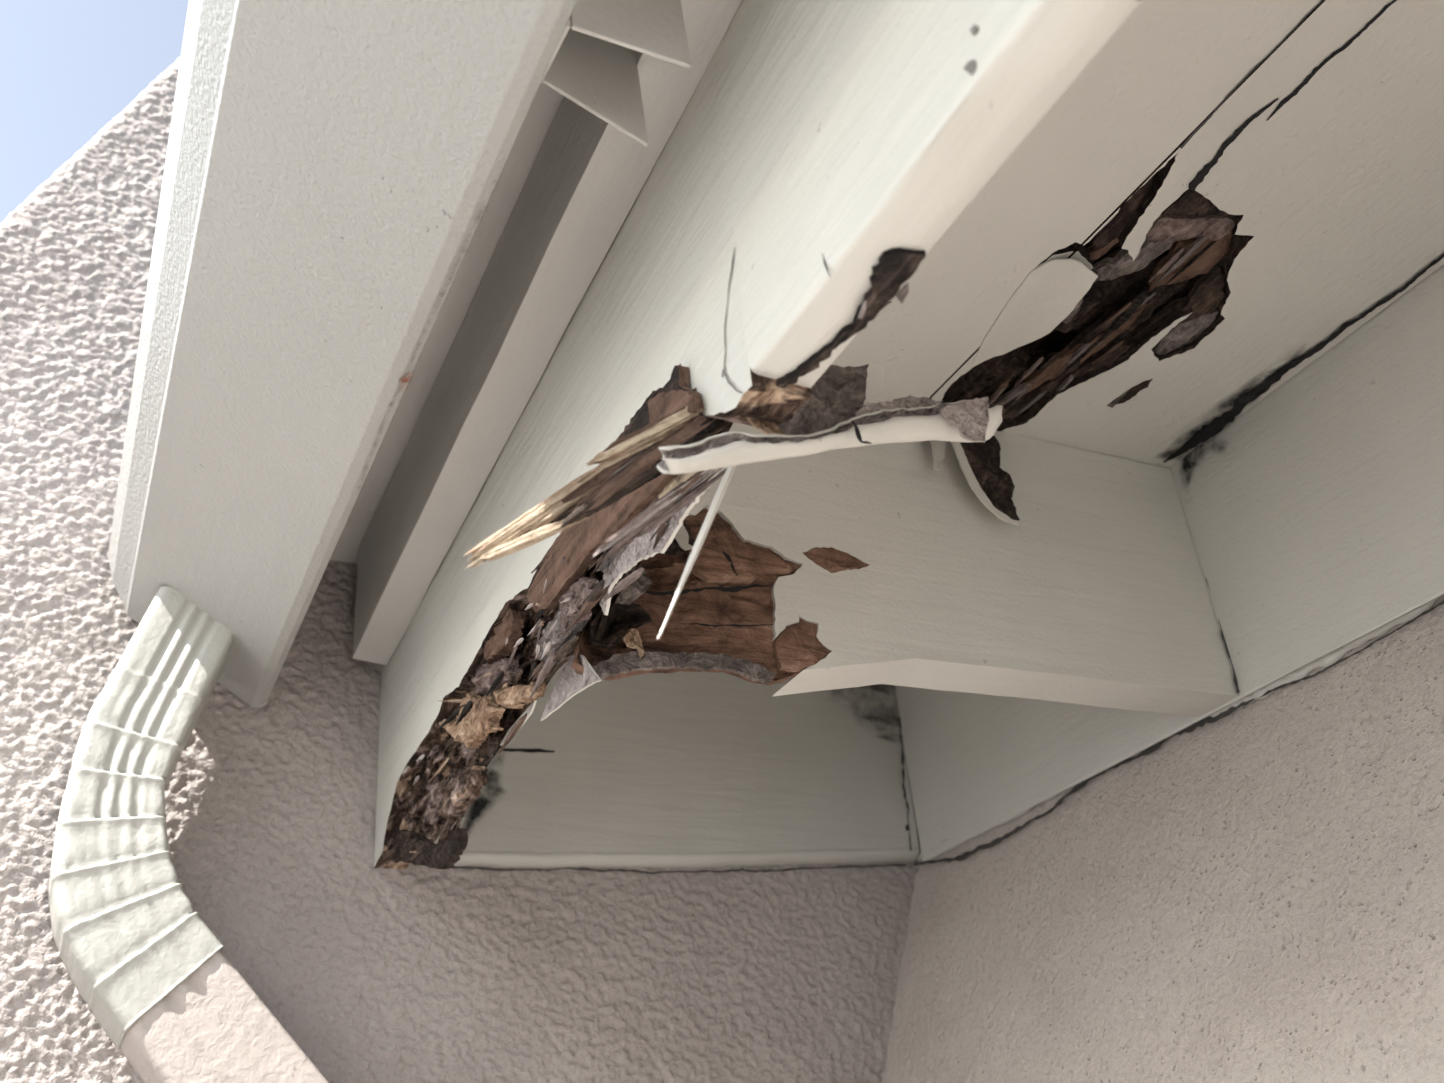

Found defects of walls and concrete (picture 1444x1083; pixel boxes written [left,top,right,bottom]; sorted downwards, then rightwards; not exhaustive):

crack [1180,0,1397,192]
peeling [896,282,909,304]
peeling [1107,379,1153,408]
leakage [1161,371,1280,483]
crack [1163,253,1444,463]
peeling [674,525,693,551]
peeling [803,547,869,573]
peeling [623,628,644,659]
peeling [500,655,602,746]
crack [452,579,1444,874]